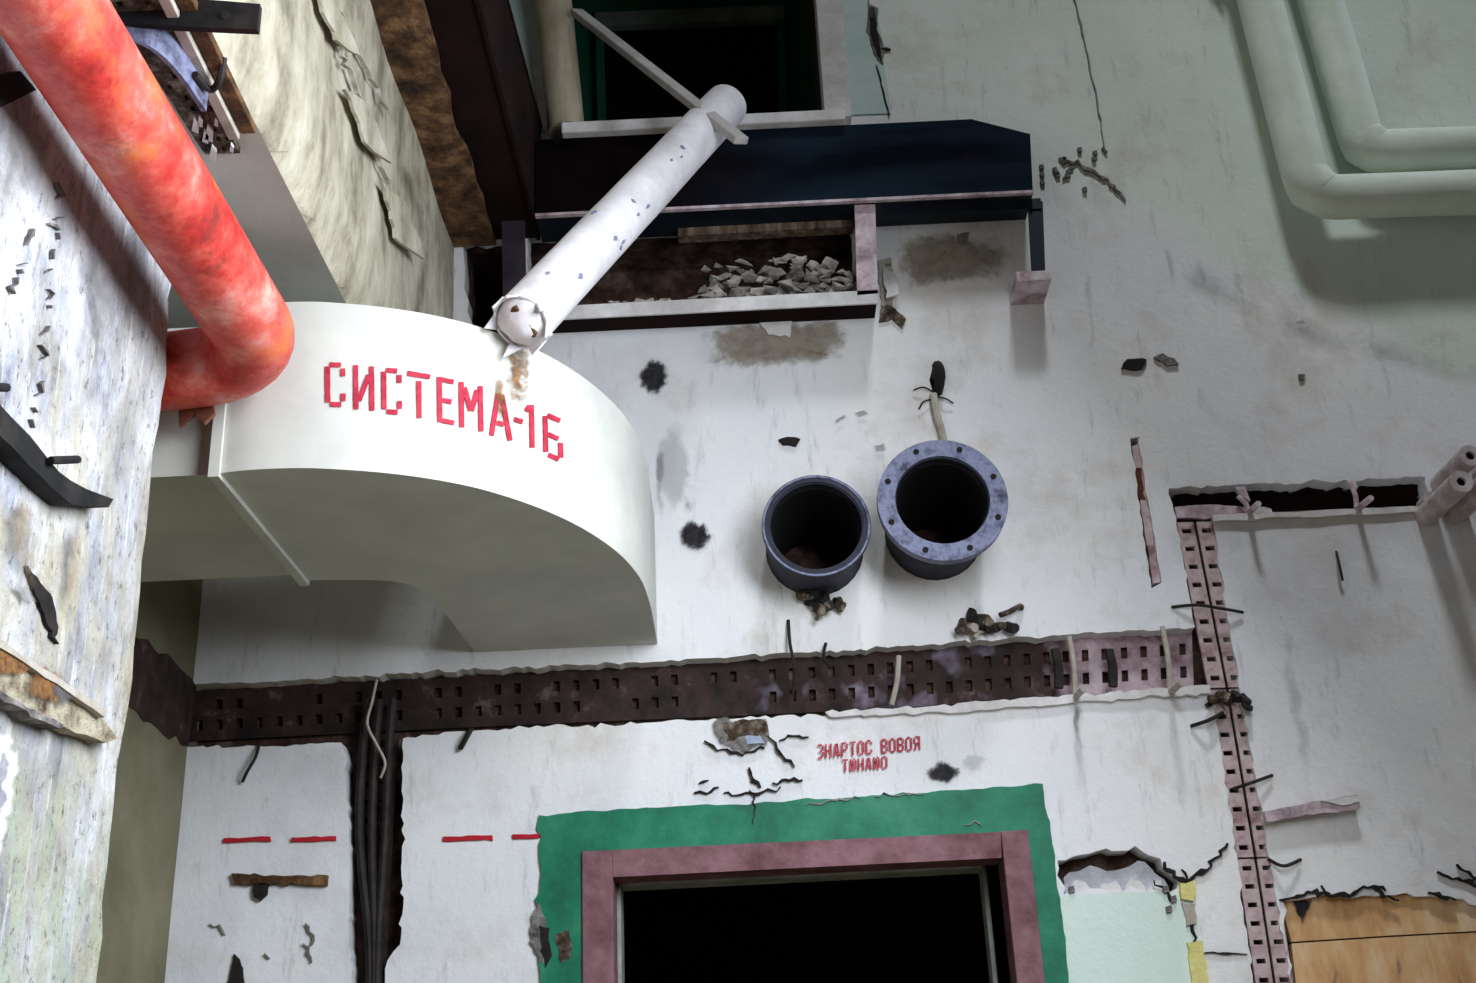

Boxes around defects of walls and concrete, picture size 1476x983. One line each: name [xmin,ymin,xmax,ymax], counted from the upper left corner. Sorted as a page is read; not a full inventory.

crack [317,0,425,259]
crack [1039,0,1126,202]
spalling [16,566,59,644]
peeling [0,735,18,851]
spalling [704,717,809,768]
spalling [1062,861,1177,913]